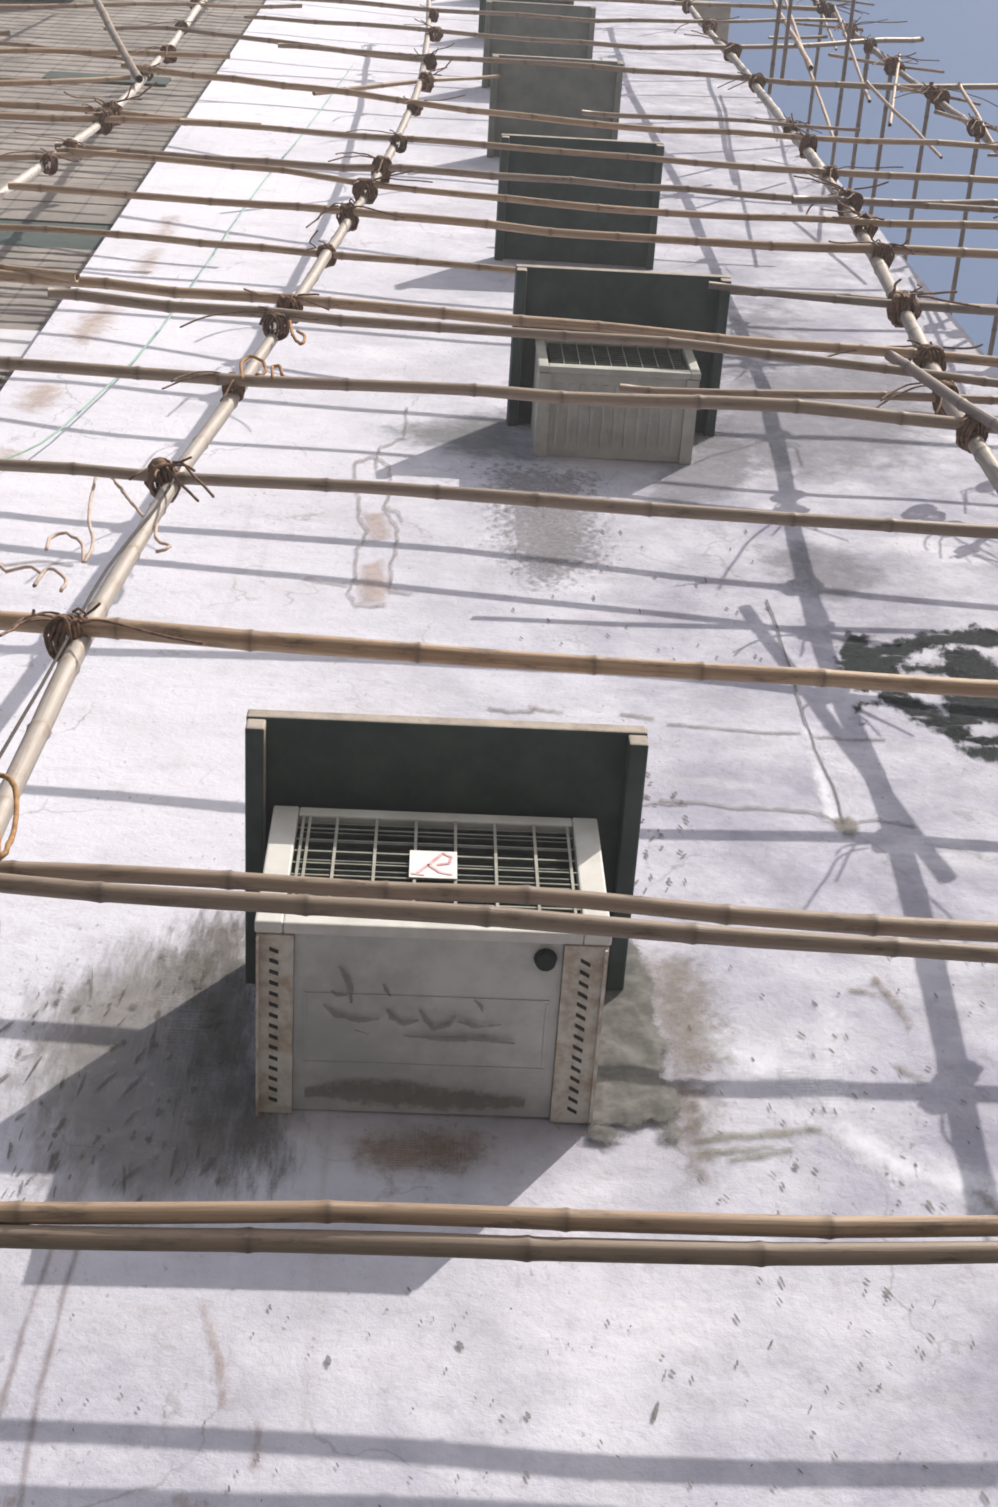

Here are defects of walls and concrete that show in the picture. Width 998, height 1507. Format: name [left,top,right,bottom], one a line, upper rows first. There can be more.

leakage [406,418,615,590]
crack [766,599,844,824]